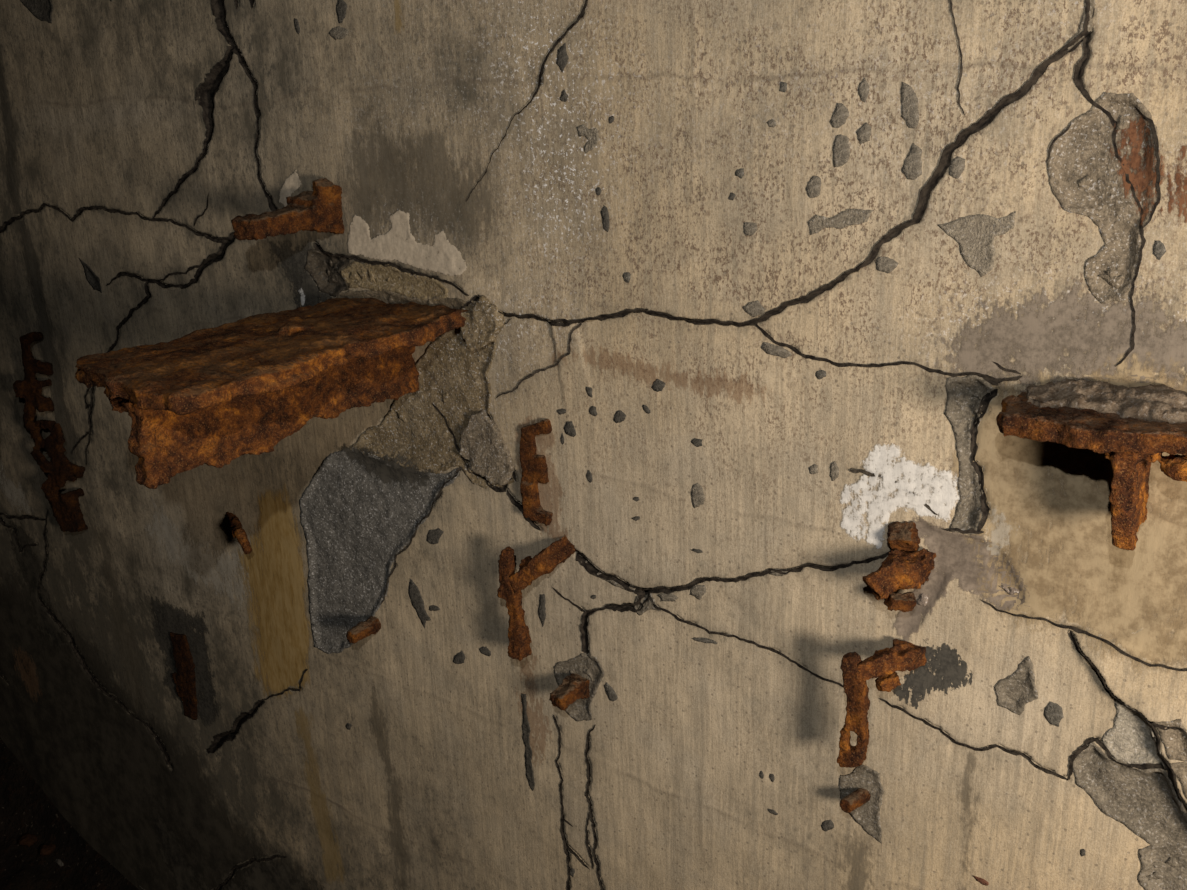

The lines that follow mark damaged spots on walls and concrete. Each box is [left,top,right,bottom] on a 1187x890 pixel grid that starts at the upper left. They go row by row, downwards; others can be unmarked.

crack [0,0,277,353]
peeling [304,209,477,310]
crack [314,0,1161,534]
spalling [1046,92,1166,304]
corrosion [1110,116,1187,225]
corrosion [13,332,88,533]
spalling [299,327,517,654]
corrosion [519,419,553,526]
water stain [840,443,960,549]
crack [553,550,891,688]
crack [880,600,1187,810]
spalling [1071,699,1187,890]